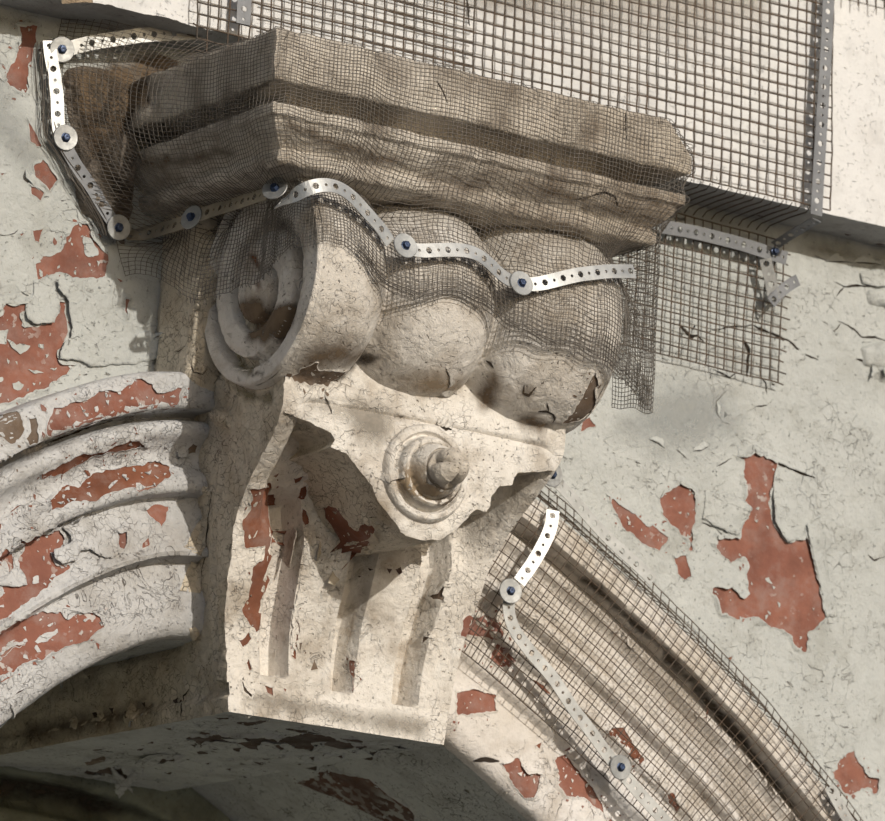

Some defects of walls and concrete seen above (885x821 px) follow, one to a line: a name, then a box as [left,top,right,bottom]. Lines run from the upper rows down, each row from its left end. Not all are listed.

peeling [2,20,41,100]
peeling [860,262,885,287]
peeling [871,365,885,383]
peeling [236,474,383,644]
peeling [604,444,829,654]
peeling [290,583,318,670]
peeling [166,717,418,821]
peeling [499,747,621,821]
peeling [830,745,882,799]